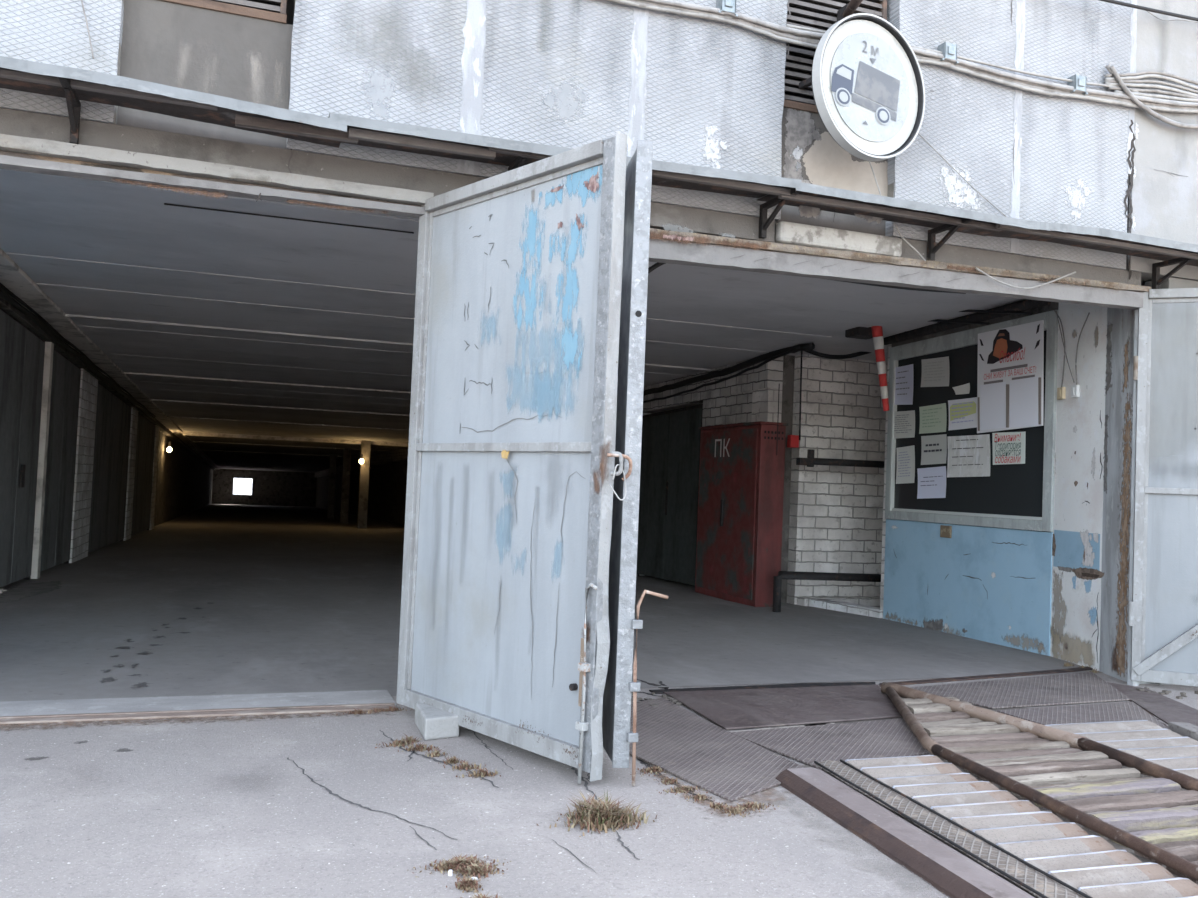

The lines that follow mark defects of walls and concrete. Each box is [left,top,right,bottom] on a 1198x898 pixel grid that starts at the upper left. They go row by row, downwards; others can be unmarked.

spalling [787,0,876,31]
peeling [783,44,888,197]
peeling [513,166,603,371]
corrosion [649,232,767,250]
crack [1124,120,1188,280]
peeling [1006,529,1104,667]
crack [287,757,458,850]